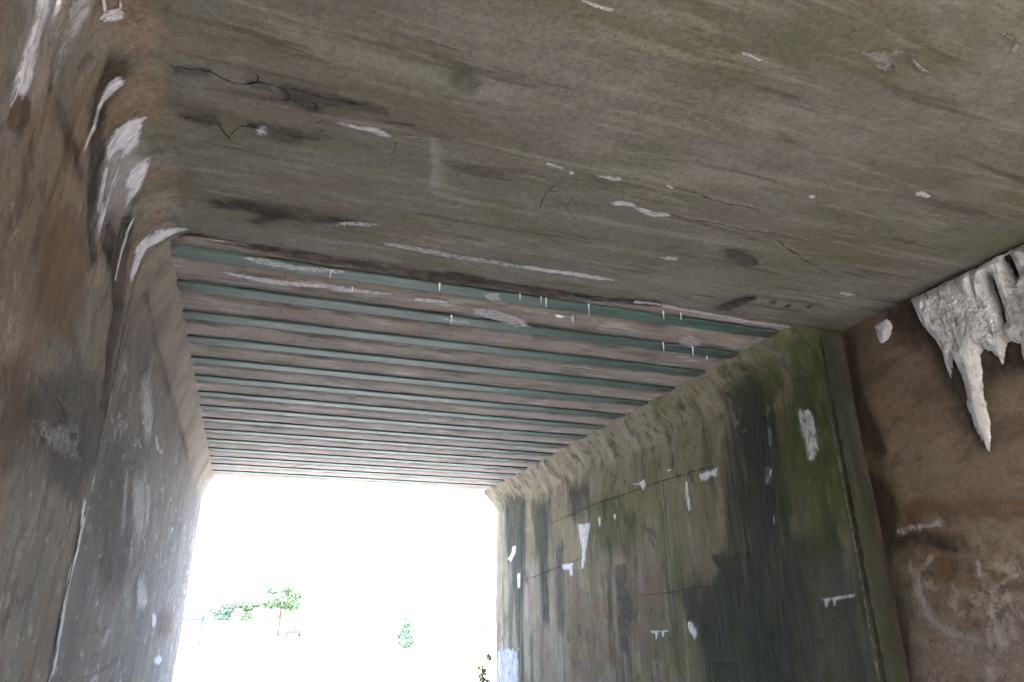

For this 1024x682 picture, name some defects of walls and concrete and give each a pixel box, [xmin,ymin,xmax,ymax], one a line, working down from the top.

crack [168,67,434,153]
crack [630,186,847,280]
leakage [1004,255,1019,277]
leakage [19,57,790,682]
leakage [874,303,974,429]
crack [544,462,723,527]
leakage [672,375,878,682]
leakage [835,336,1024,682]